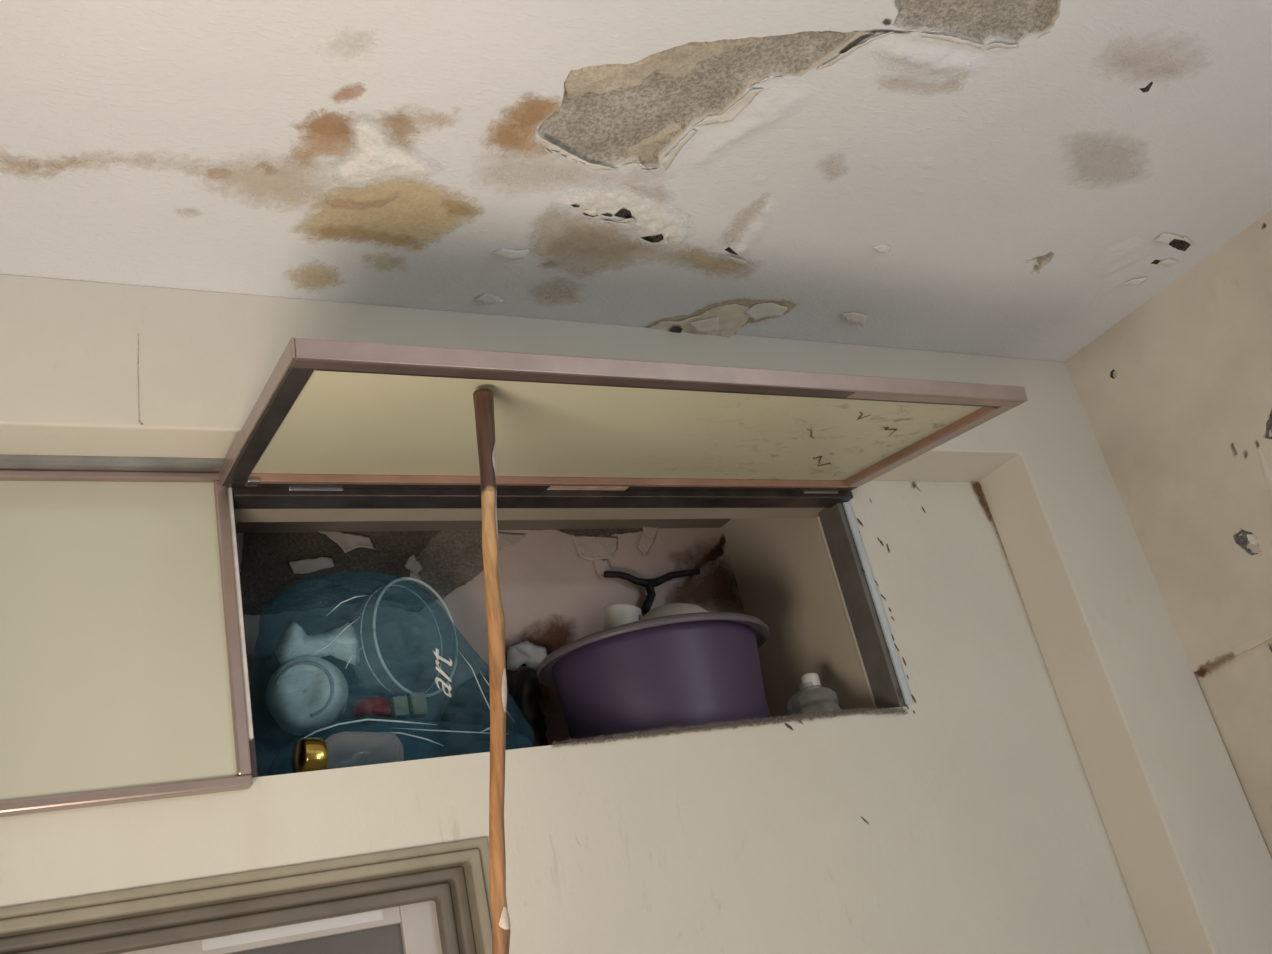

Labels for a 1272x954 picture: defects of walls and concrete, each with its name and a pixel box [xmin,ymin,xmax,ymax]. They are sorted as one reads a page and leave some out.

water stain [210,115,477,248]
water stain [490,99,558,153]
flaking render [536,0,1061,171]
water stain [536,211,753,275]
peeling [648,302,788,338]
peeling [240,493,659,615]